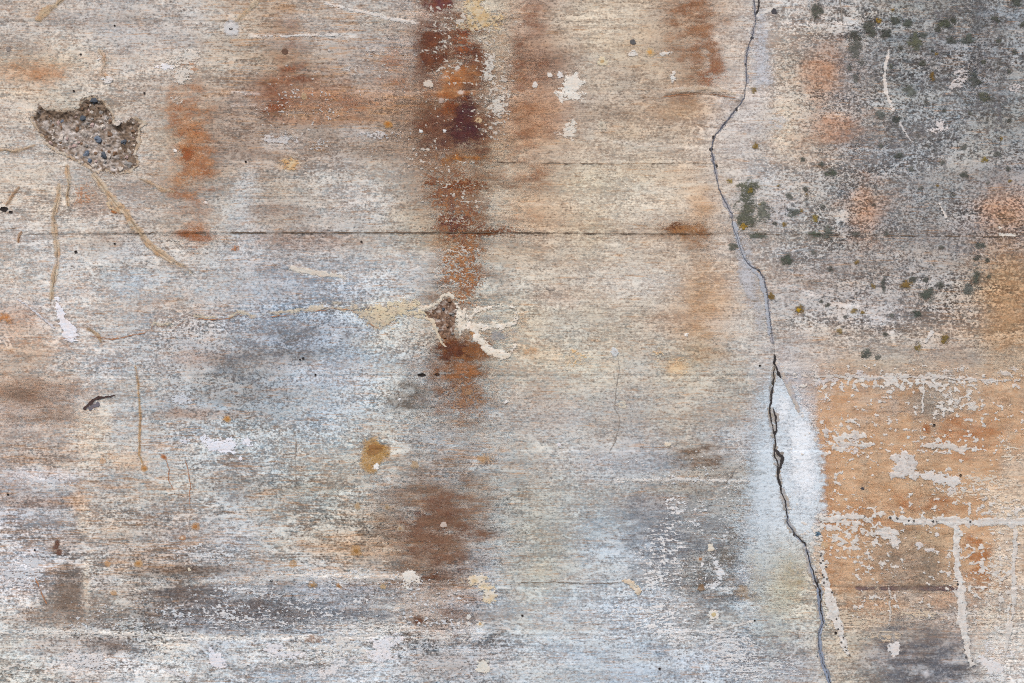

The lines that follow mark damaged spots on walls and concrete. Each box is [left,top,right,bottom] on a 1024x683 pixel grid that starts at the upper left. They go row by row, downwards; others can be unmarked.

rust [647,0,723,86]
spalling [28,96,148,176]
rust [168,100,214,202]
rust [414,0,524,306]
rust [178,224,211,254]
peeling [350,292,519,360]
rust [432,338,492,416]
crack [663,0,831,683]
rust [362,439,389,472]
rust [397,491,490,582]